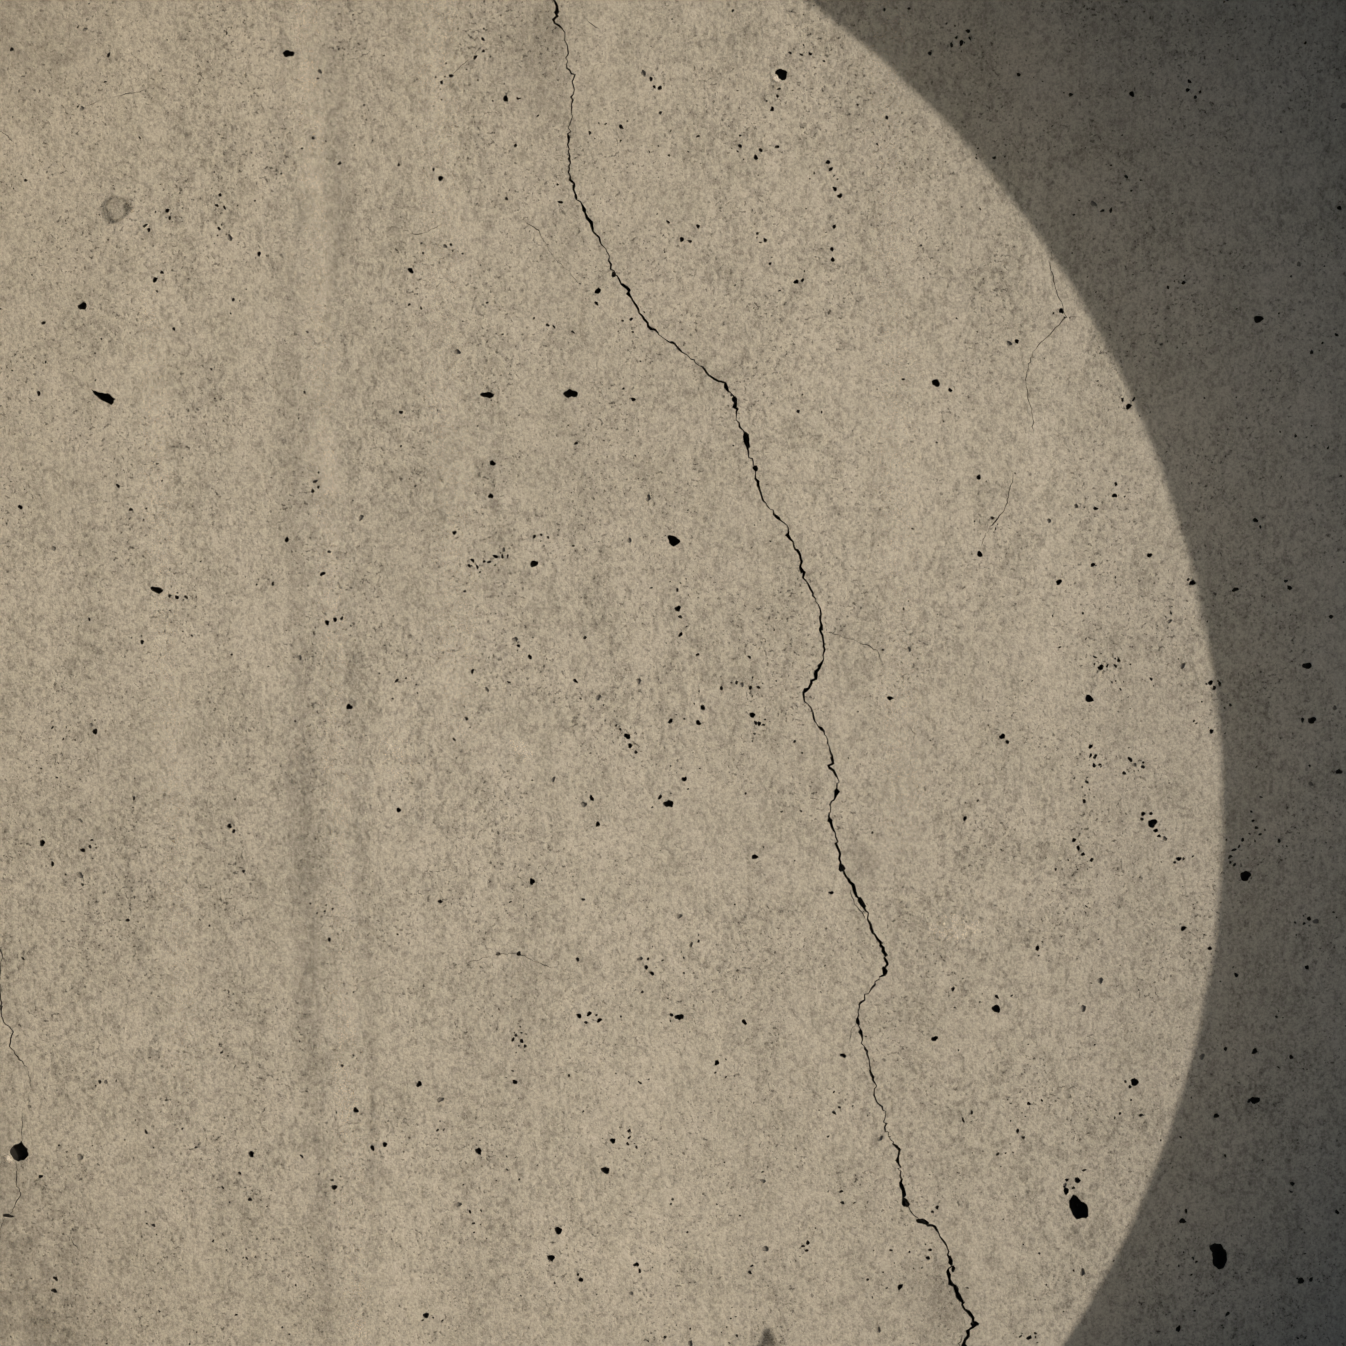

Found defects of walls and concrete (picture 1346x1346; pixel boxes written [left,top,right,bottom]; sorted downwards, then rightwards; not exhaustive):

crack [552,0,979,1346]